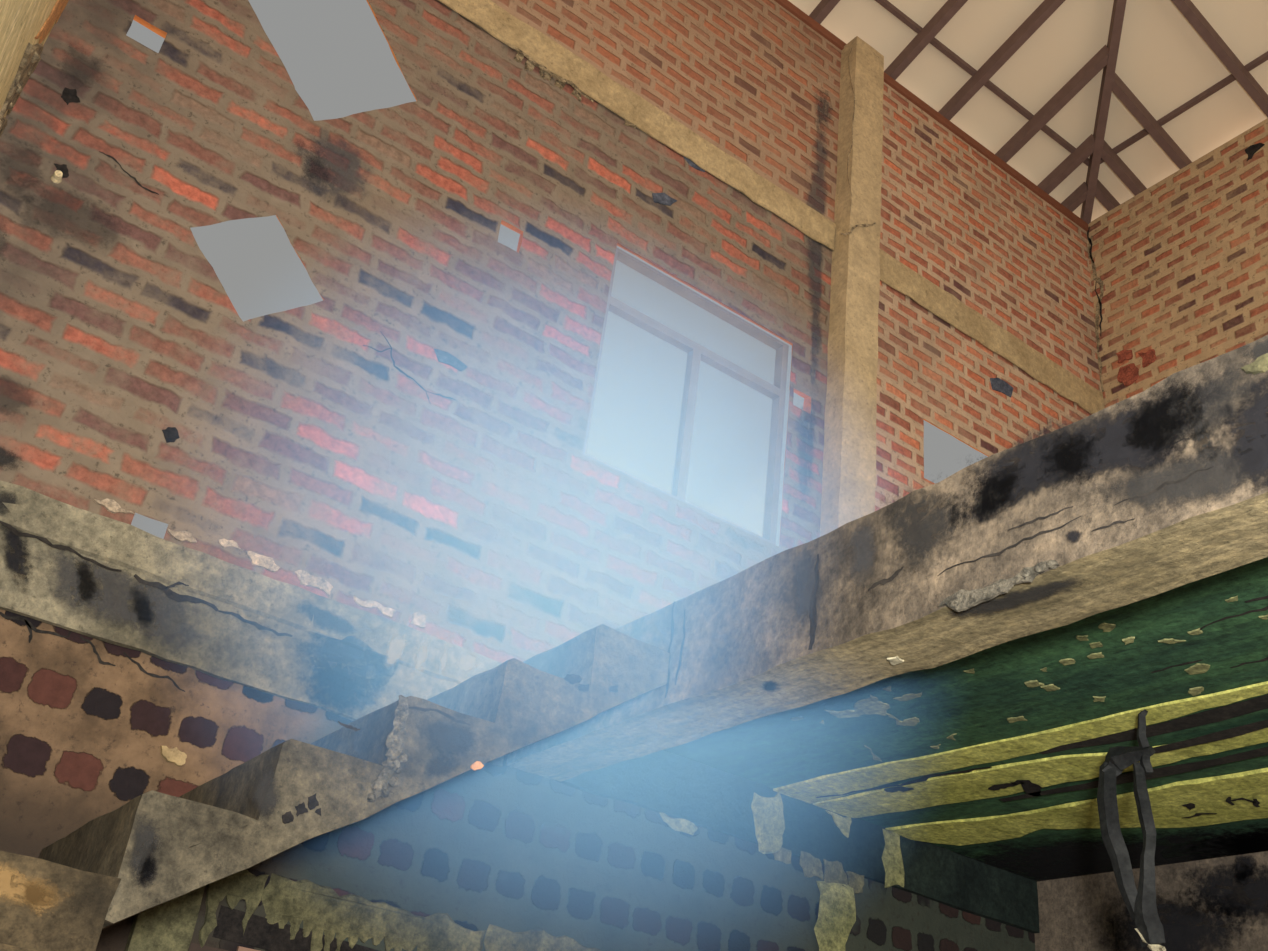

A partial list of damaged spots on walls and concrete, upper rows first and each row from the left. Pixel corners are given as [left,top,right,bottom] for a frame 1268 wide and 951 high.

crack [1087,226,1104,392]
leakage [0,447,16,467]
leakage [0,492,32,585]
crack [0,521,292,637]
spalling [218,539,280,572]
crack [938,466,1214,576]
leakage [886,369,1268,565]
crack [0,612,185,692]
leakage [298,604,476,718]
peeling [1024,623,1135,691]
peeling [1158,628,1203,644]
flaking render [773,663,1268,846]